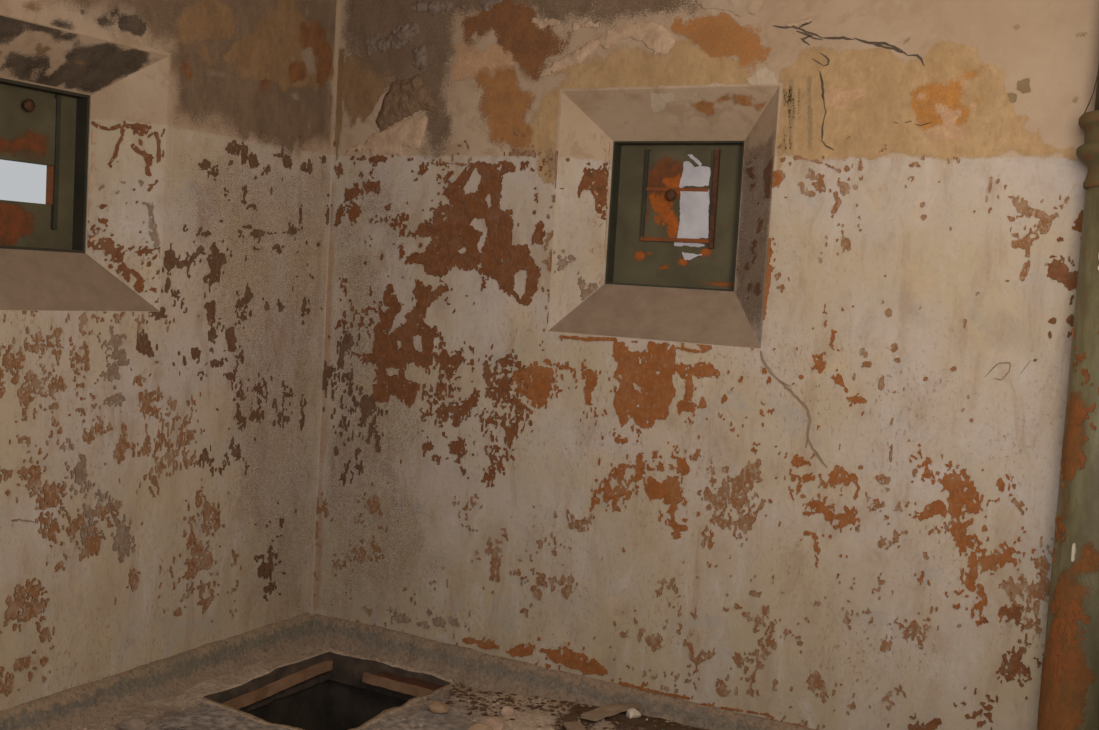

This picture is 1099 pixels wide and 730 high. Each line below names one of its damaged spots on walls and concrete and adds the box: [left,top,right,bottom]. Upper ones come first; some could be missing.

water stain [511,0,707,31]
water stain [19,0,487,168]
crack [773,21,924,150]
peeling [914,91,977,142]
peeling [1007,78,1031,102]
peeling [1072,210,1083,239]
peeling [1044,255,1078,339]
peeling [0,121,307,623]
peeling [198,114,1053,730]
crack [760,351,827,467]
rust [1037,329,1099,730]
peeling [0,578,55,697]